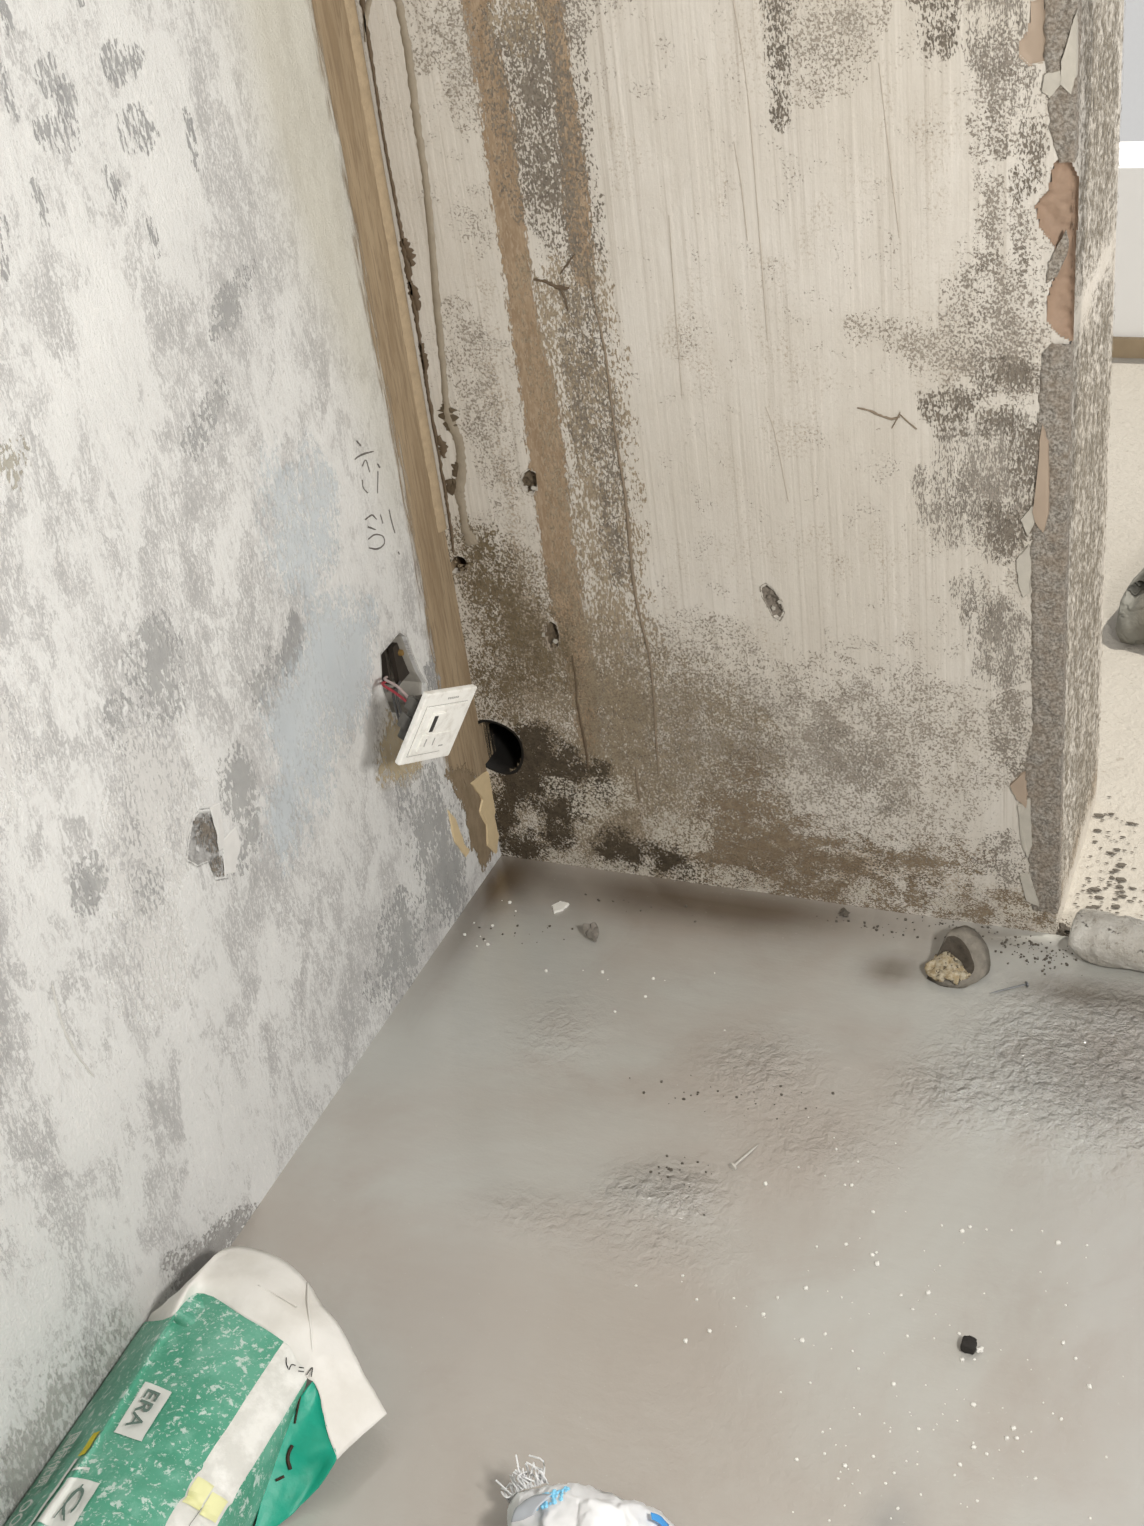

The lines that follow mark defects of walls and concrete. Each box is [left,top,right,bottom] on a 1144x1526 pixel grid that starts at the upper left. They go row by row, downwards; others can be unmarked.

damp [311,0,1070,937]
spalling [620,0,1125,914]
spalling [188,740,262,881]
peeling [70,850,109,918]
peeling [135,859,165,920]